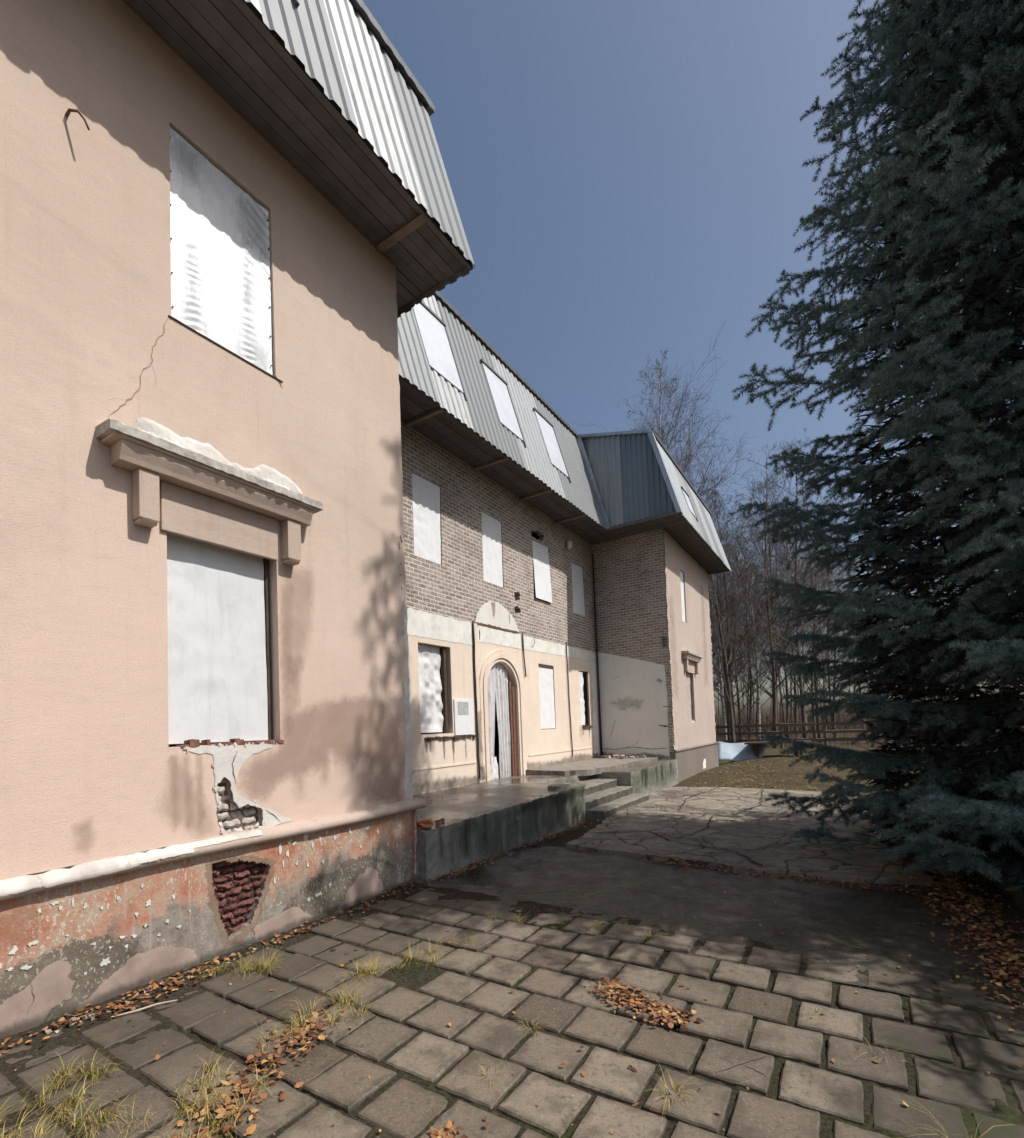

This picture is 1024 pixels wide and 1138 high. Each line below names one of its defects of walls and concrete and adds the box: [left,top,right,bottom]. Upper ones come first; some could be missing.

crack [108,318,169,418]
damp [251,700,401,799]
damp [416,769,485,793]
peeling [0,742,292,1025]
spalling [204,826,400,947]